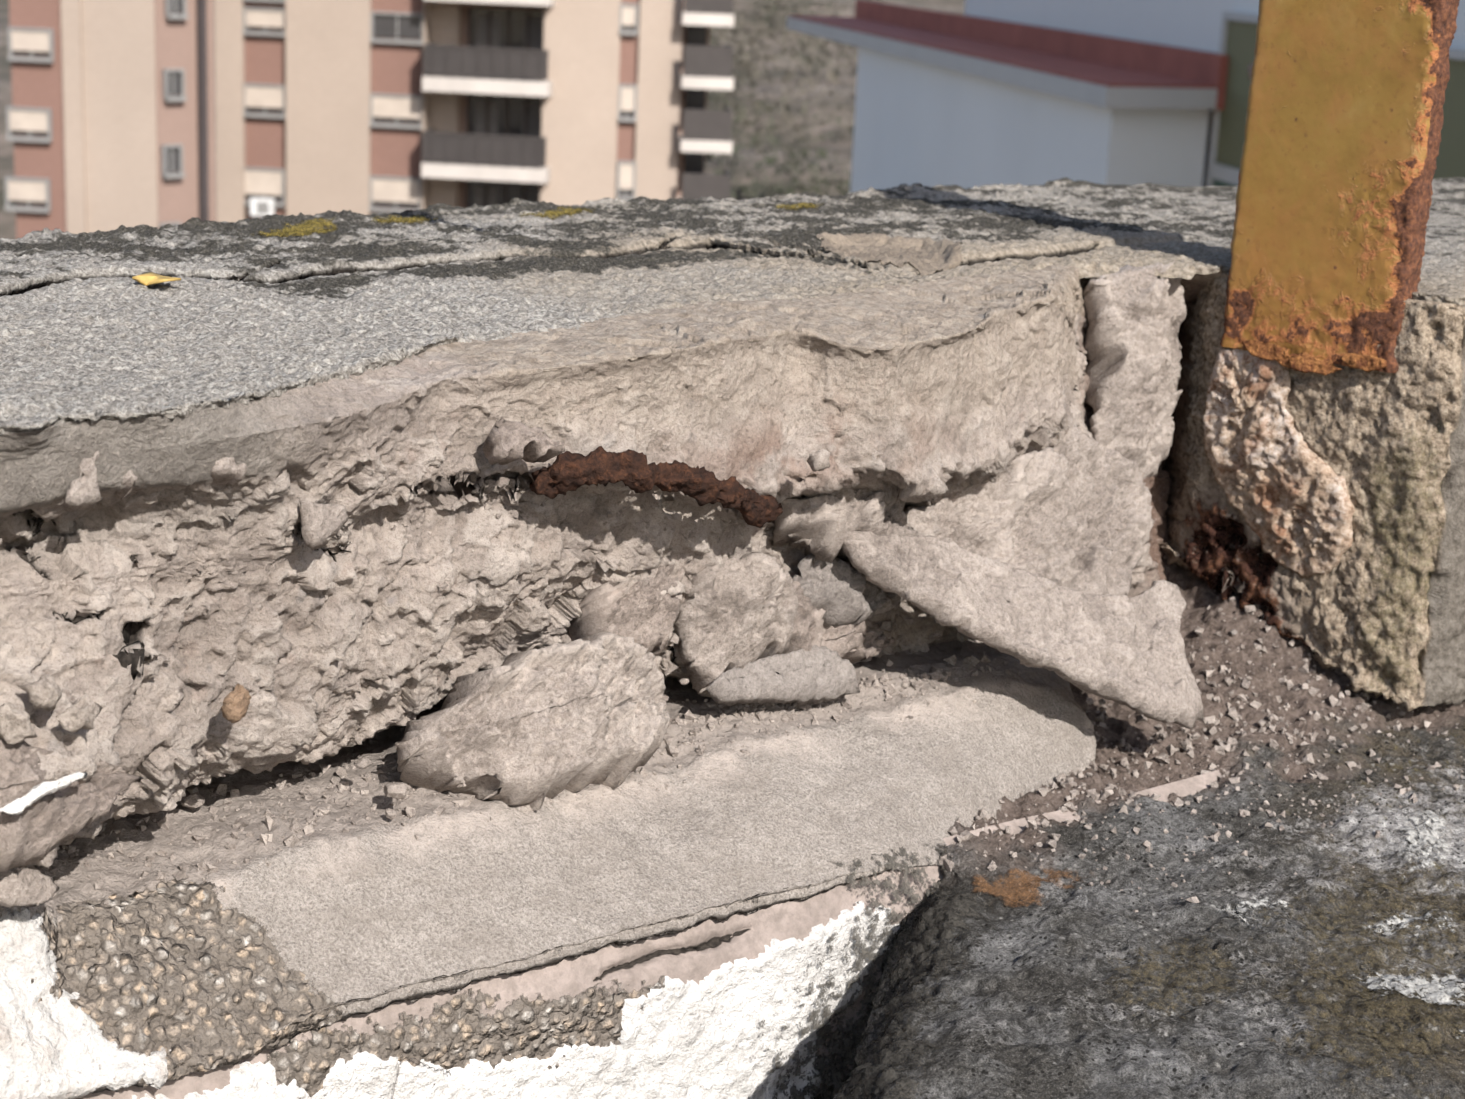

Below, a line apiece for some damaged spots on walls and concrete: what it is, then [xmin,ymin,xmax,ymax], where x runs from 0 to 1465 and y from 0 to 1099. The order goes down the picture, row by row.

crack [0,256,526,297]
crack [567,237,803,259]
crack [960,244,1098,266]
corrosion [529,446,783,528]
spalling [0,232,1222,872]
corrosion [1183,500,1304,642]
corrosion [974,869,1073,907]
peeling [0,879,665,1099]
crack [288,883,849,1044]
leakage [753,844,1007,1099]
crack [90,1083,154,1094]